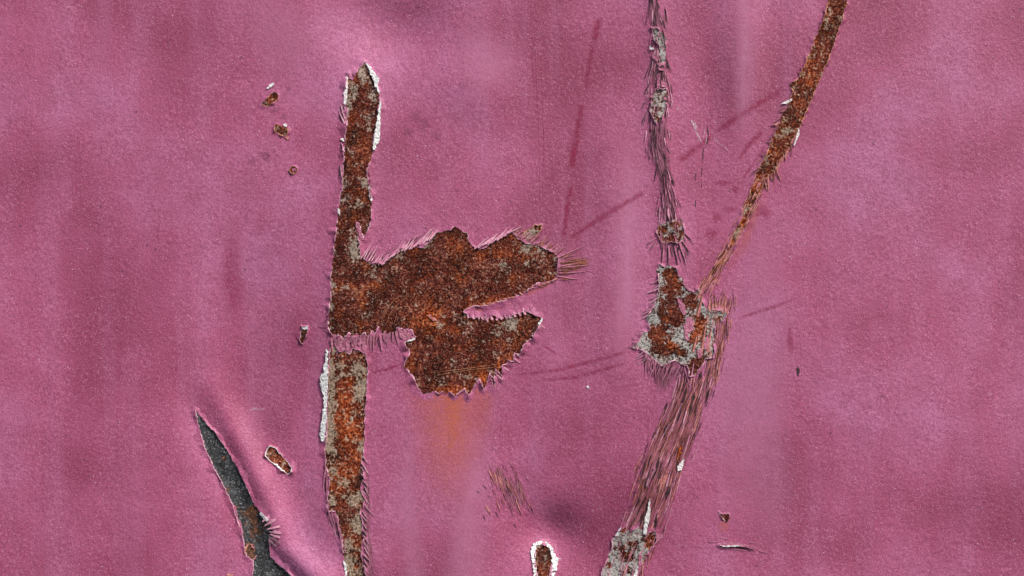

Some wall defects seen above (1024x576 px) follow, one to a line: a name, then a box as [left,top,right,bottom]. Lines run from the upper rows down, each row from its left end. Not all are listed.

rust [318,58,587,576]
rust [627,261,737,393]
spalling [191,405,297,576]